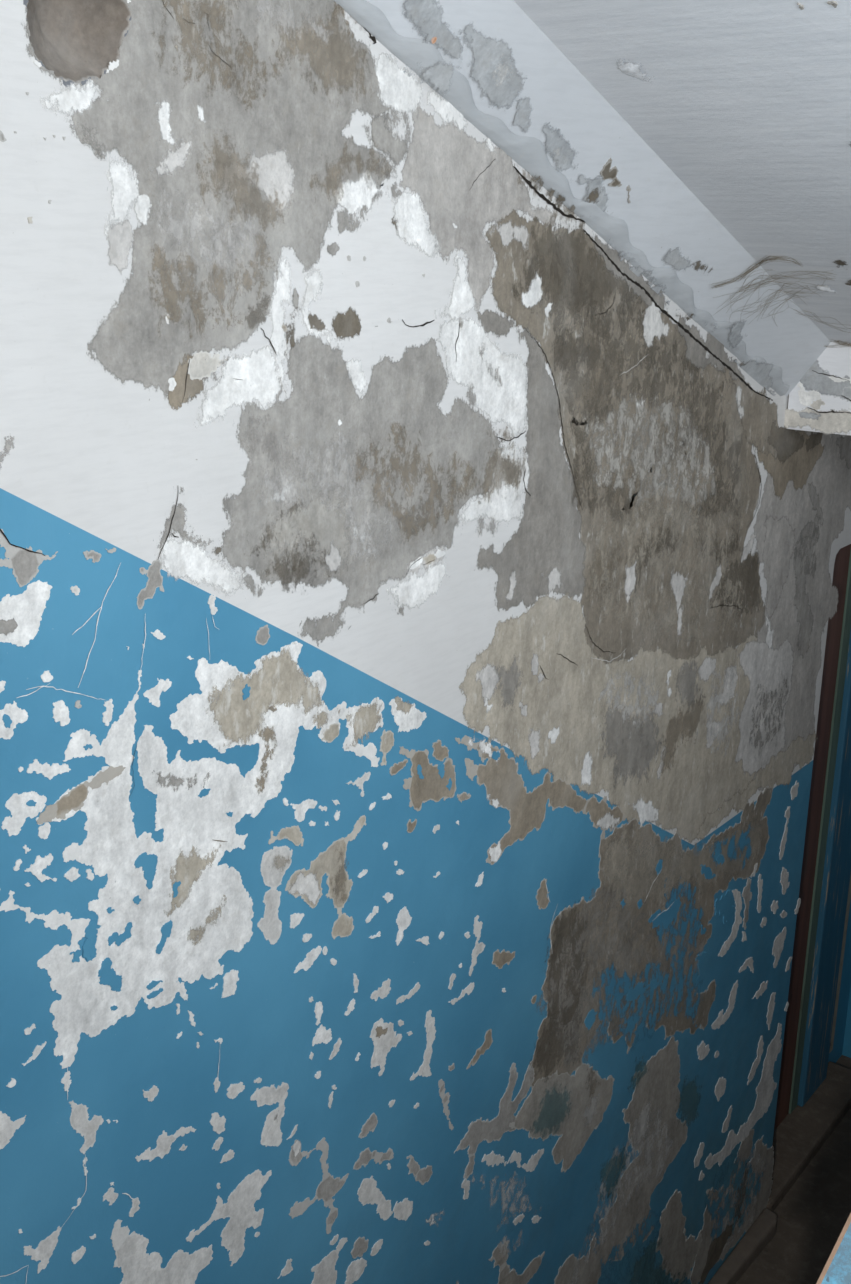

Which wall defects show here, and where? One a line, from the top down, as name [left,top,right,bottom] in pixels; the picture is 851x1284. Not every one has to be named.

crack [335,4,377,44]
crack [514,166,773,401]
peeling [661,247,713,272]
spalling [784,360,851,434]
flaking render [0,0,631,1284]
damp [459,209,851,1088]
peeling [344,781,801,1284]